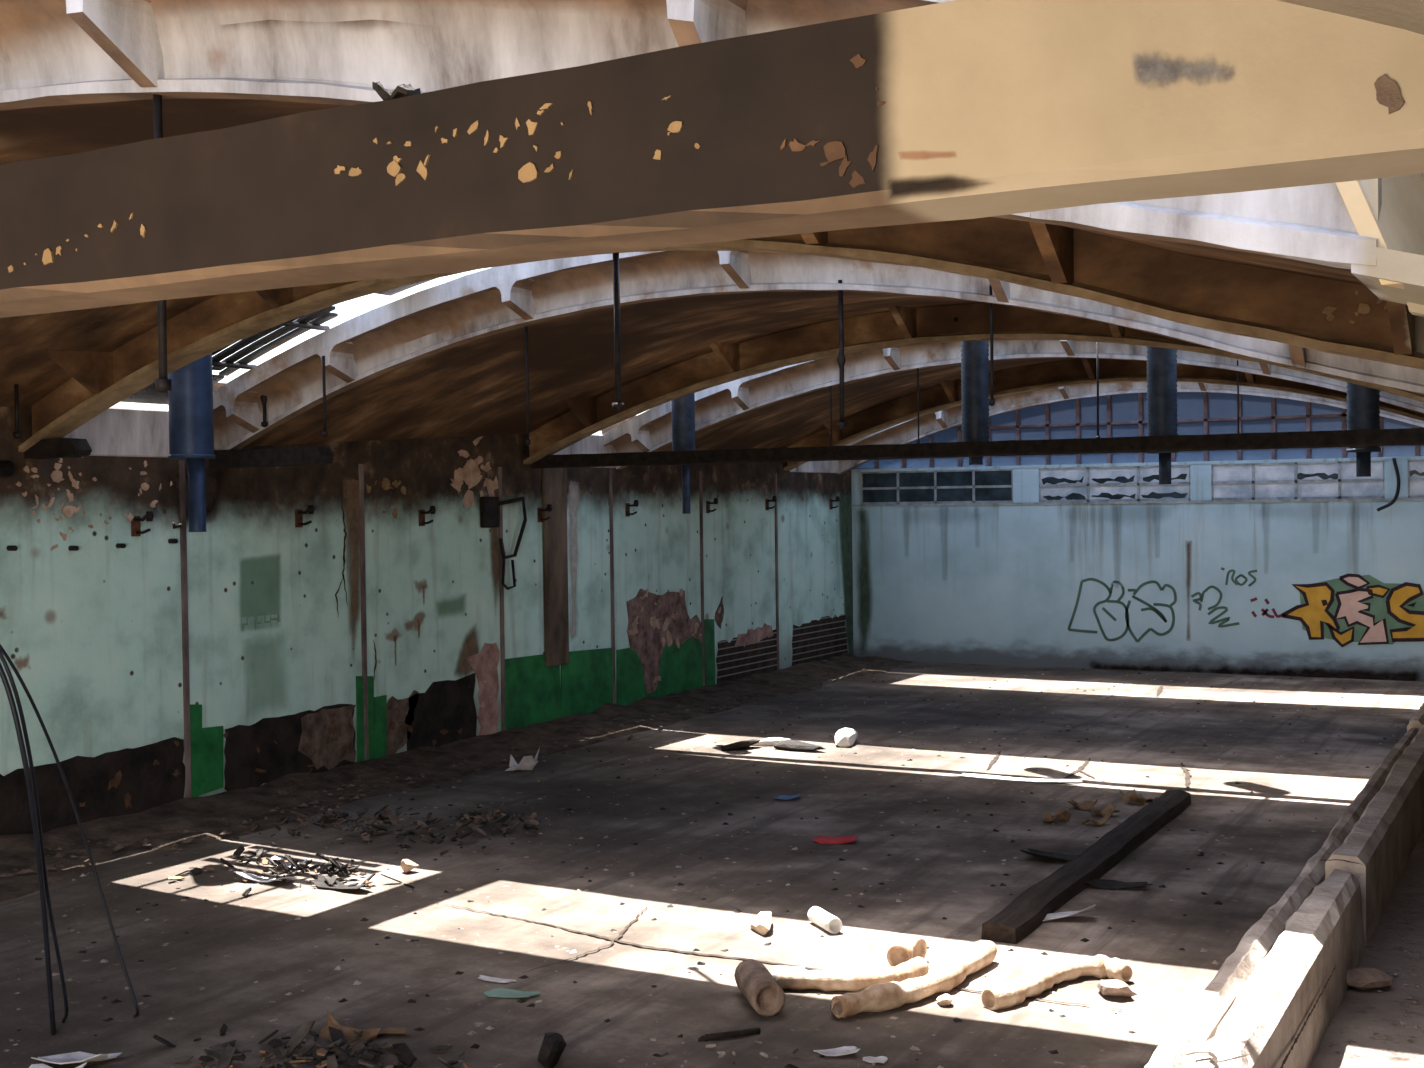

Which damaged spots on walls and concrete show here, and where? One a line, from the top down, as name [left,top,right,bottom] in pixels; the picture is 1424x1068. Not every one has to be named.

peeling [850,54,867,69]
damp [1135,56,1231,83]
peeling [334,165,362,177]
peeling [373,103,574,186]
peeling [653,121,683,160]
peeling [780,138,879,188]
peeling [450,436,498,508]
damp [491,527,499,593]
spalling [626,589,848,694]
spalling [387,643,500,755]
spalling [223,704,356,791]
spalling [0,737,185,835]